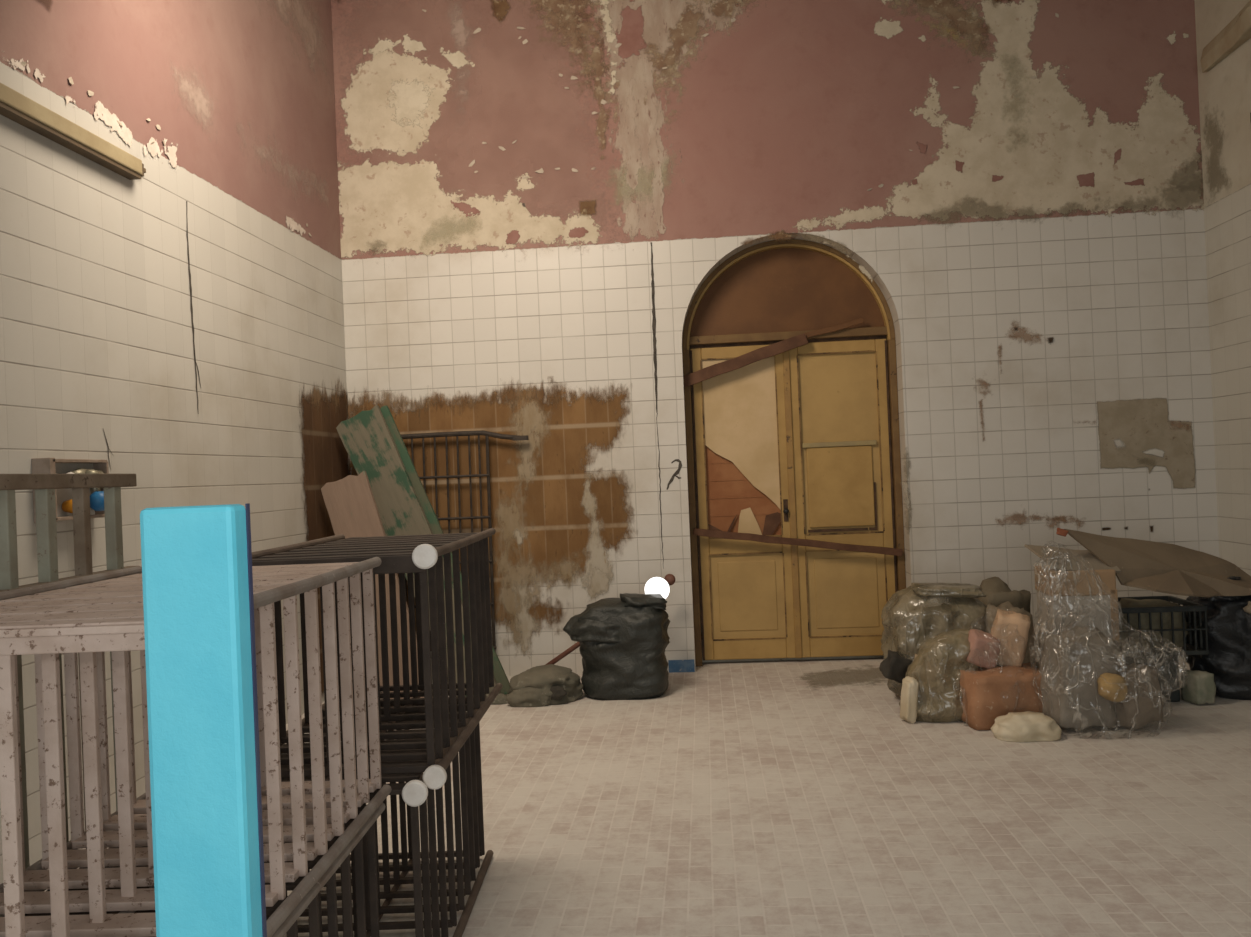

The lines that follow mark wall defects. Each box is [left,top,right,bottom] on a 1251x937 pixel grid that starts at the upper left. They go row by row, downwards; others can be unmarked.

peeling [2,55,46,82]
peeling [65,77,178,168]
leakage [491,0,510,22]
peeling [337,0,743,259]
leakage [531,0,624,160]
peeling [742,0,1204,244]
peeling [286,215,311,236]
crack [186,201,201,414]
peeling [301,379,633,653]
crack [650,242,664,569]
peeling [1097,398,1196,489]